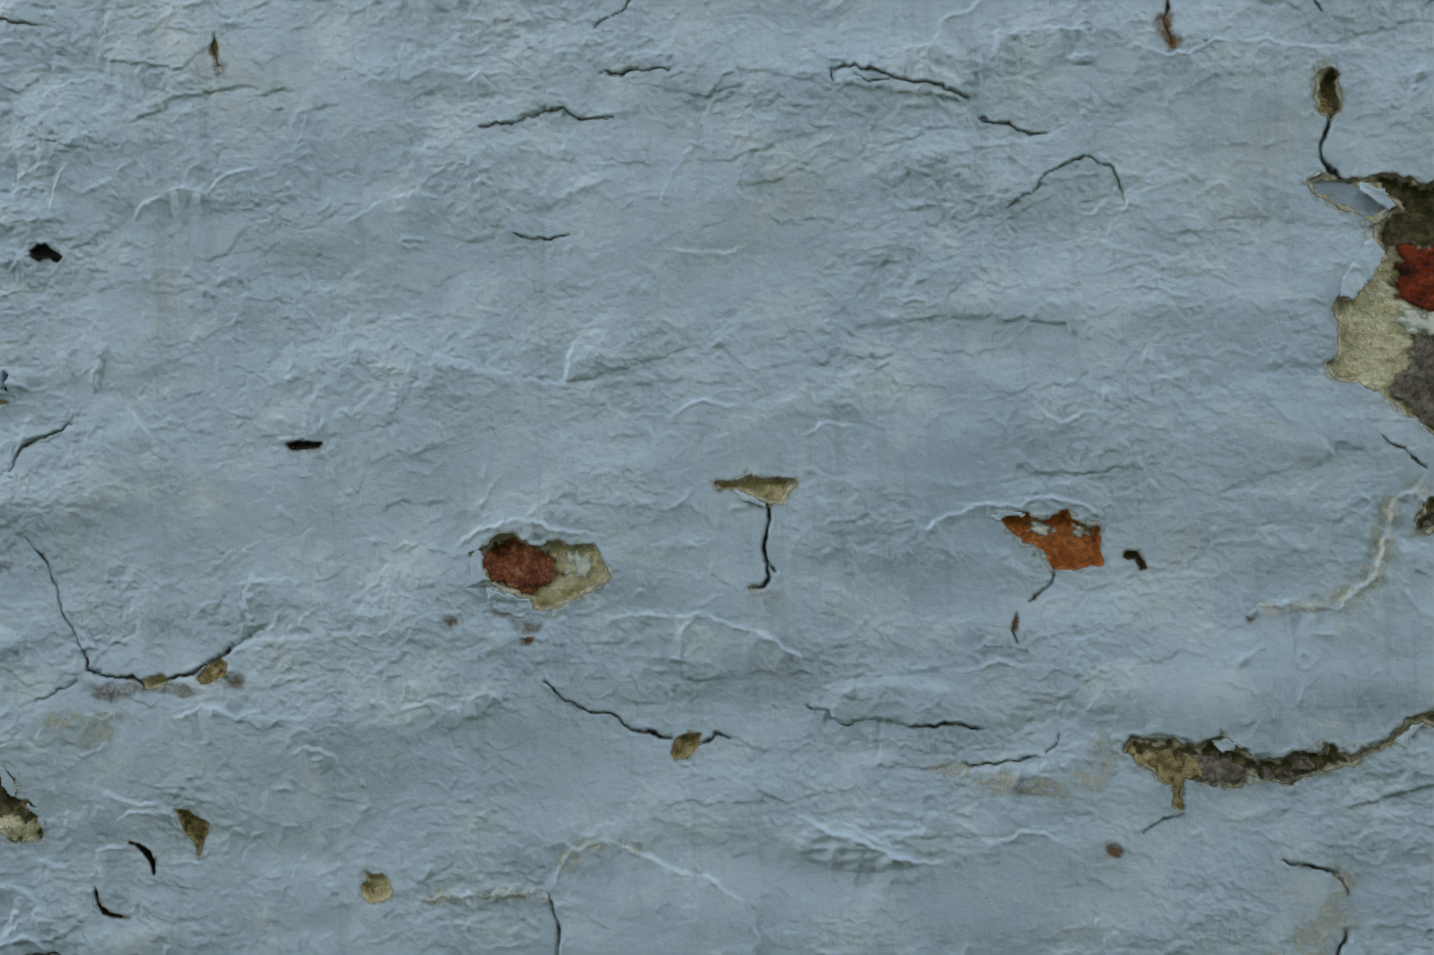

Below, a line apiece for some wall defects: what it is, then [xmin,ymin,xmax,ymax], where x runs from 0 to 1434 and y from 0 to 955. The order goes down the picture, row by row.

corrosion [1156,13,1181,49]
crack [831,65,1037,135]
flaking render [1303,170,1434,434]
flaking render [710,475,799,508]
flaking render [463,533,613,618]
crack [752,504,775,589]
flaking render [990,508,1104,571]
flaking render [1123,550,1147,571]
crack [36,551,257,699]
flaking render [1123,712,1434,812]
flaking render [0,766,48,845]
crack [549,896,561,944]